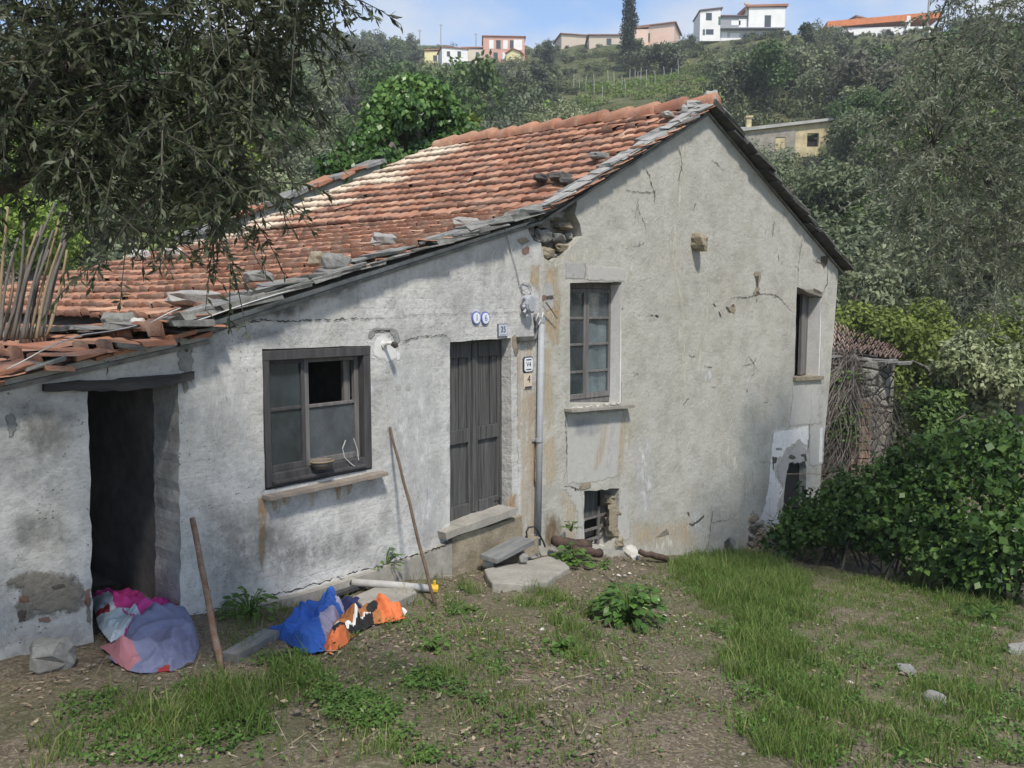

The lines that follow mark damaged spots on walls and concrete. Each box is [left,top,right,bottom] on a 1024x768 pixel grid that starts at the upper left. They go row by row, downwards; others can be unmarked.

spalling [514,208,585,268]
spalling [609,500,618,535]
peeling [724,425,824,553]
spalling [7,571,92,622]